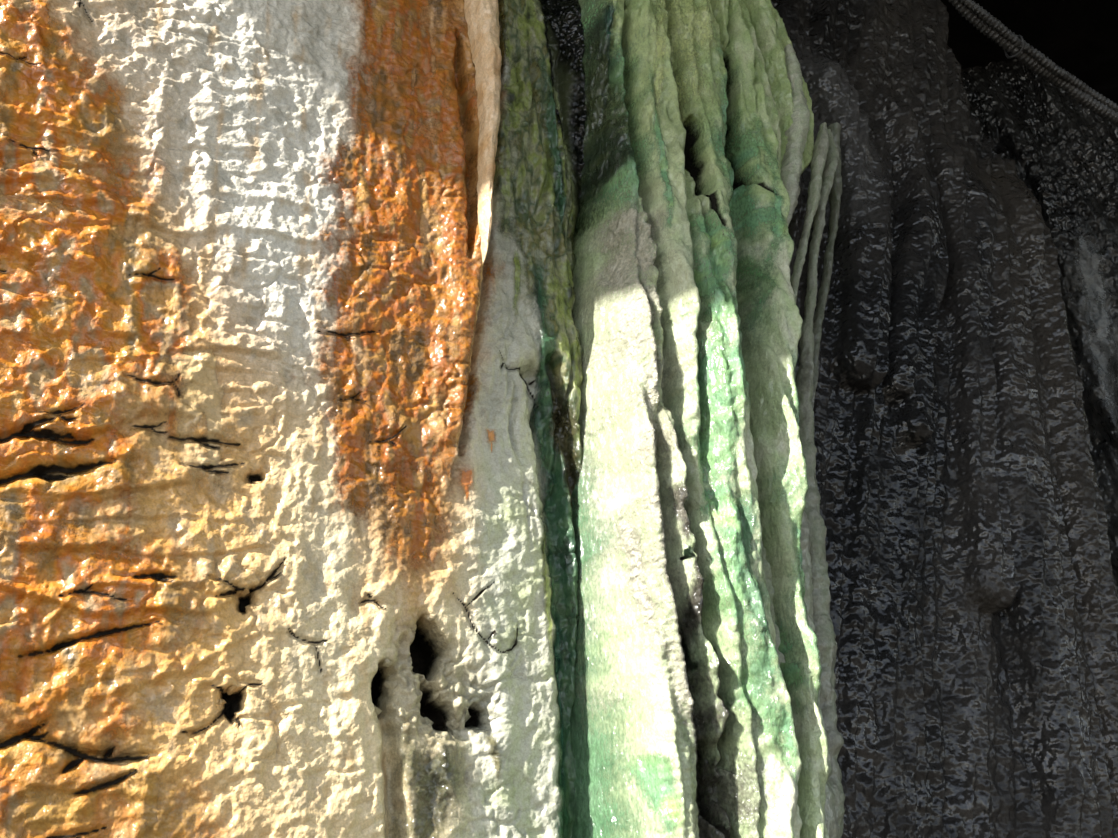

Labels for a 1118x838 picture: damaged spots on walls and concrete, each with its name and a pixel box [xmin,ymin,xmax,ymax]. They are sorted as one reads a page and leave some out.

corrosion [316,0,494,569]
leakage [513,0,677,507]
crack [0,403,116,484]
corrosion [0,0,235,838]
crack [0,723,148,794]
crack [18,573,176,657]
spalling [219,686,246,722]
crack [215,557,287,597]
spalling [371,659,398,715]
spalling [410,614,495,731]
leakage [613,483,758,838]
leakage [739,497,808,688]